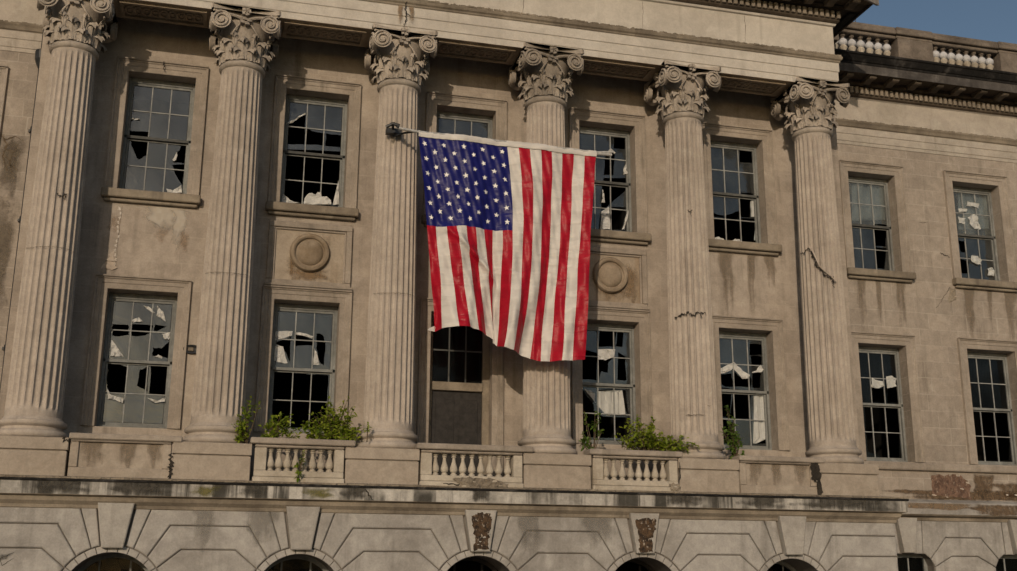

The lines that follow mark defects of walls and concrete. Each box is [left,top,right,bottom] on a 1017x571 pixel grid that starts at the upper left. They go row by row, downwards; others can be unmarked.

crack [800,246,837,286]
peeling [931,474,972,500]